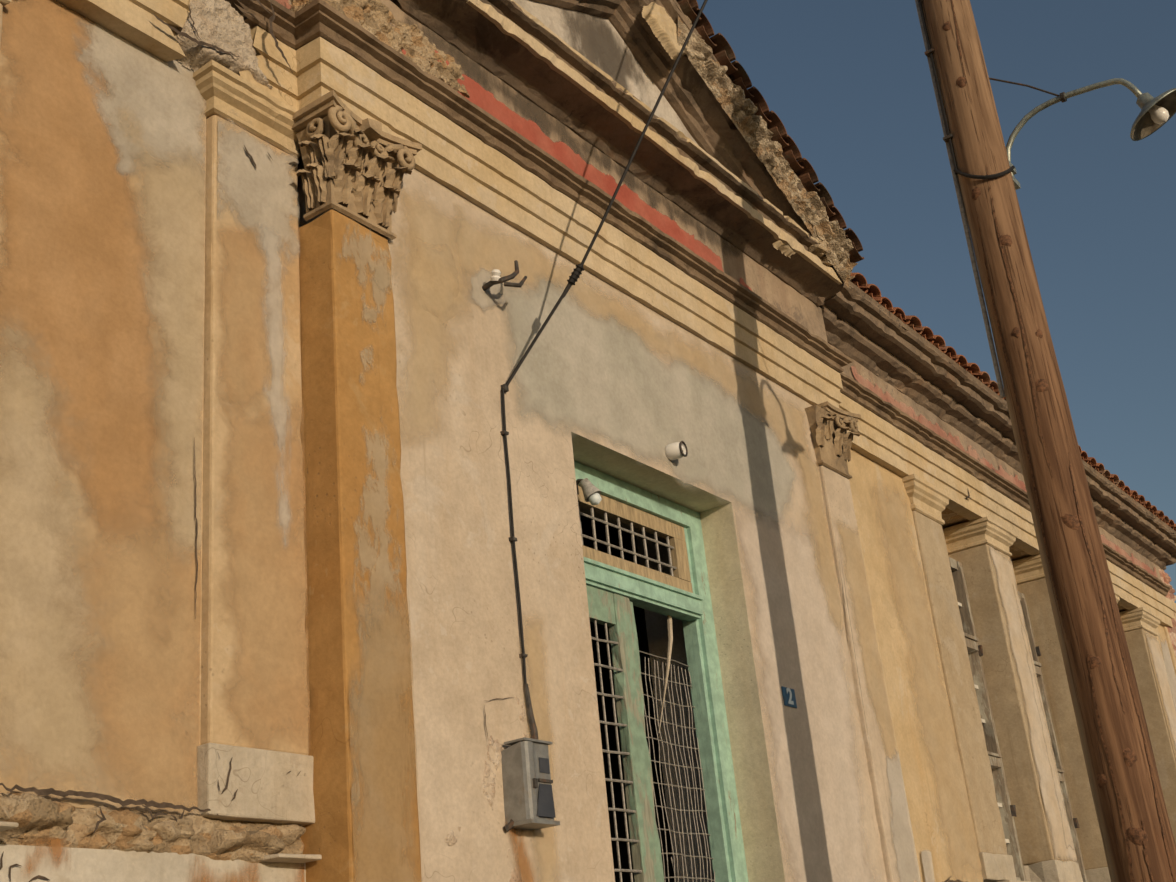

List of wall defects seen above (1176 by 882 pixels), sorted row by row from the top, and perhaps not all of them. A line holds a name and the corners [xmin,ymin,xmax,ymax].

spalling [174,0,273,89]
peeling [275,0,724,272]
spalling [642,2,858,289]
crack [192,437,200,619]
peeling [354,433,401,704]
crack [0,754,238,833]
spalling [0,791,322,863]
spalling [482,736,505,810]